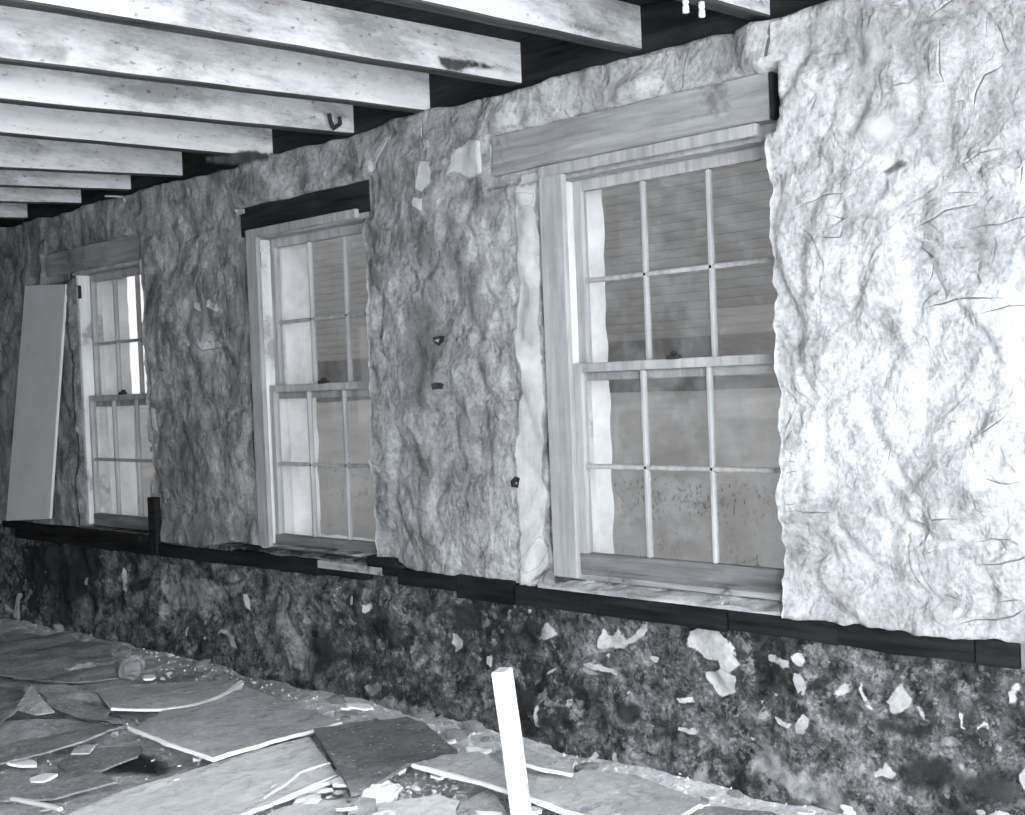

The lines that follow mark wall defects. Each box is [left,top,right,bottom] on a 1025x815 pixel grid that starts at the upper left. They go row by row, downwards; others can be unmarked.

water stain [439,57,490,71]
crack [885,0,1025,111]
crack [798,91,817,108]
flaking render [447,140,492,178]
flaking render [412,161,431,211]
crack [789,176,854,256]
crack [909,134,1025,329]